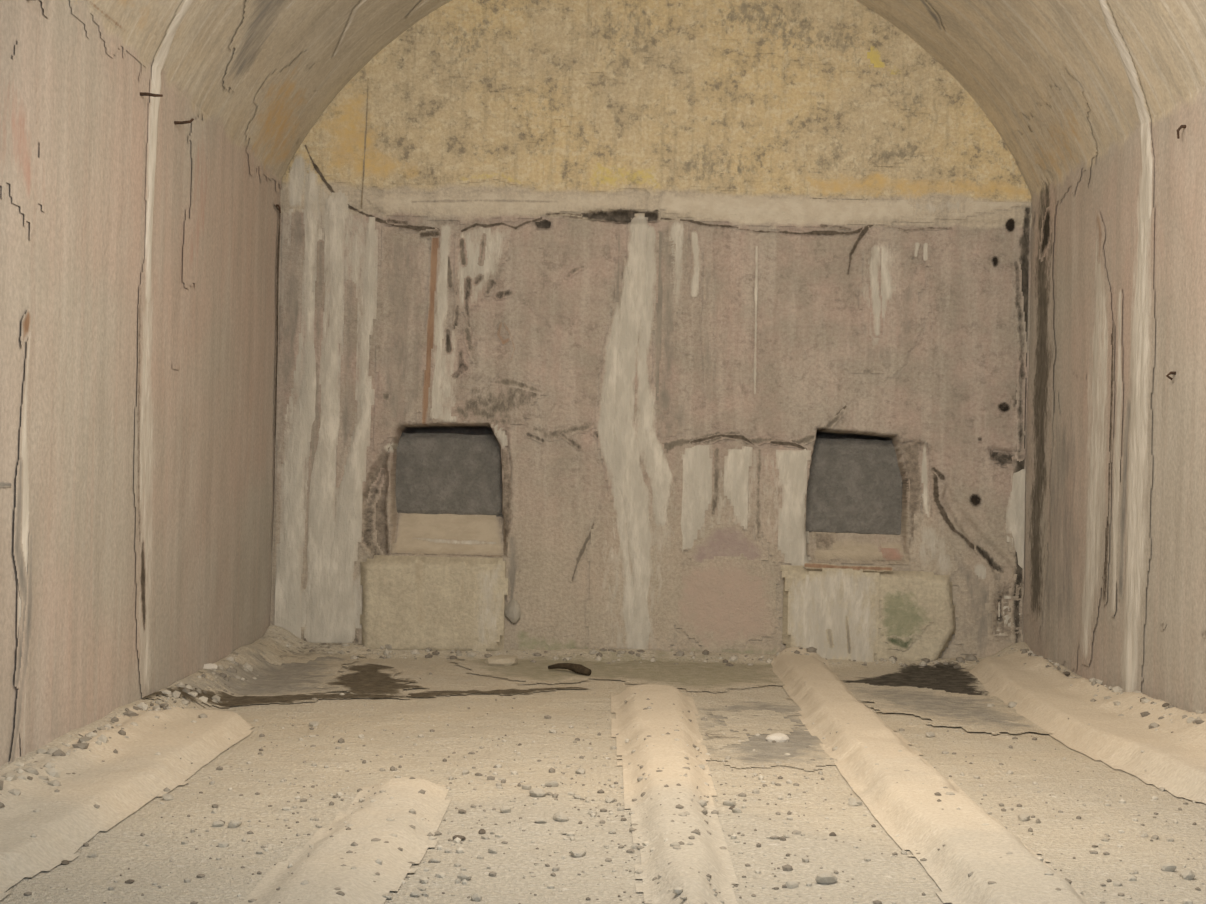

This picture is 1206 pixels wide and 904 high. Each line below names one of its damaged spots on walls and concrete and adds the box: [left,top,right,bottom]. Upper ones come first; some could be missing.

leakage [70,0,1155,735]
crack [930,467,1005,574]